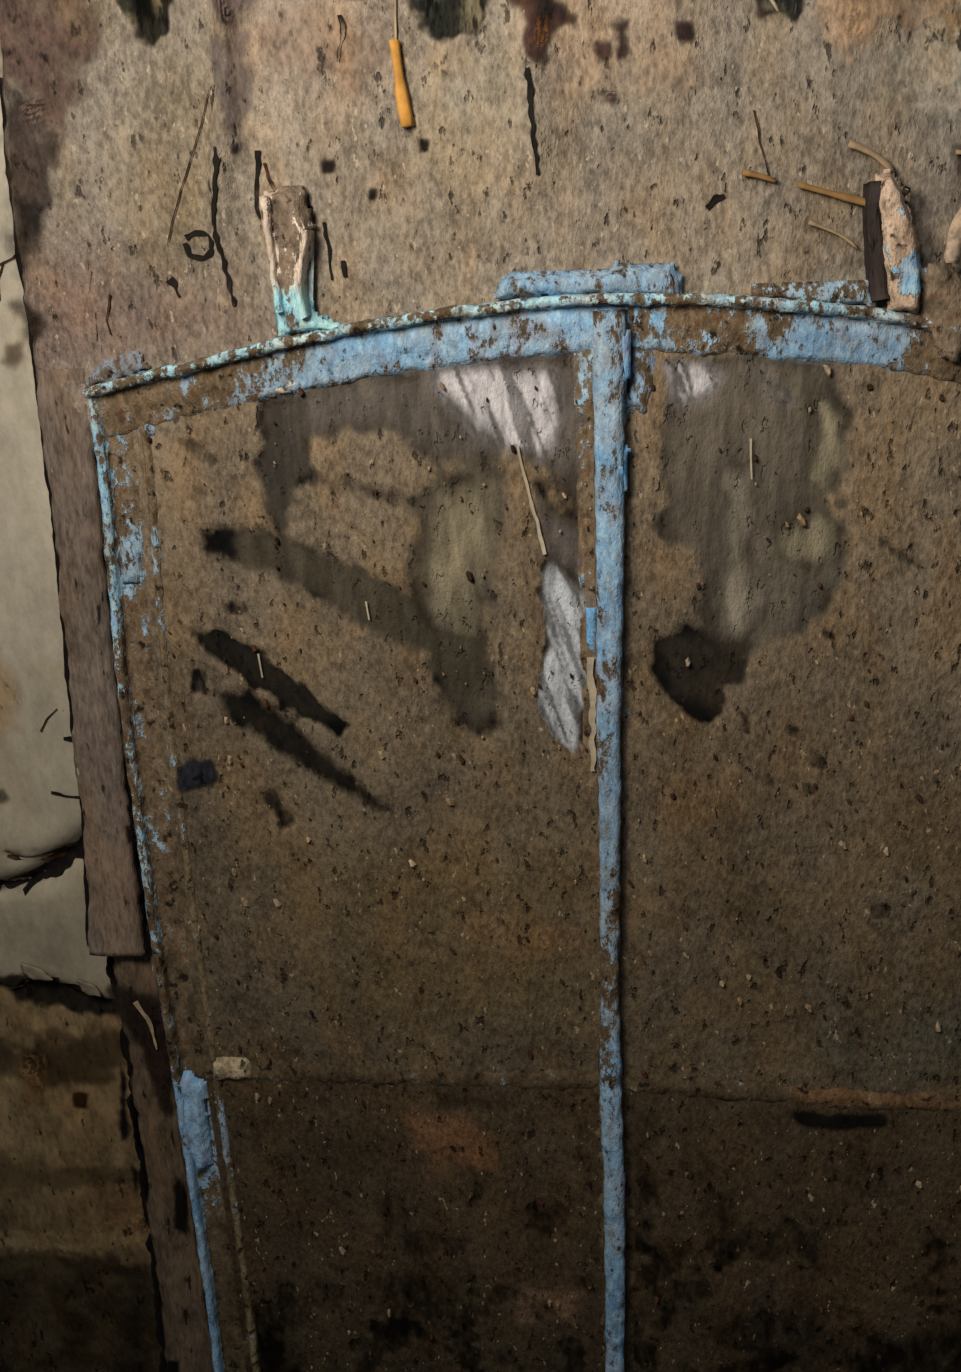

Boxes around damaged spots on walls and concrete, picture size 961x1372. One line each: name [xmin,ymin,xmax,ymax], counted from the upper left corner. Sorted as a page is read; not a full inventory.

rust [510,0,575,64]
spalling [125,804,137,844]